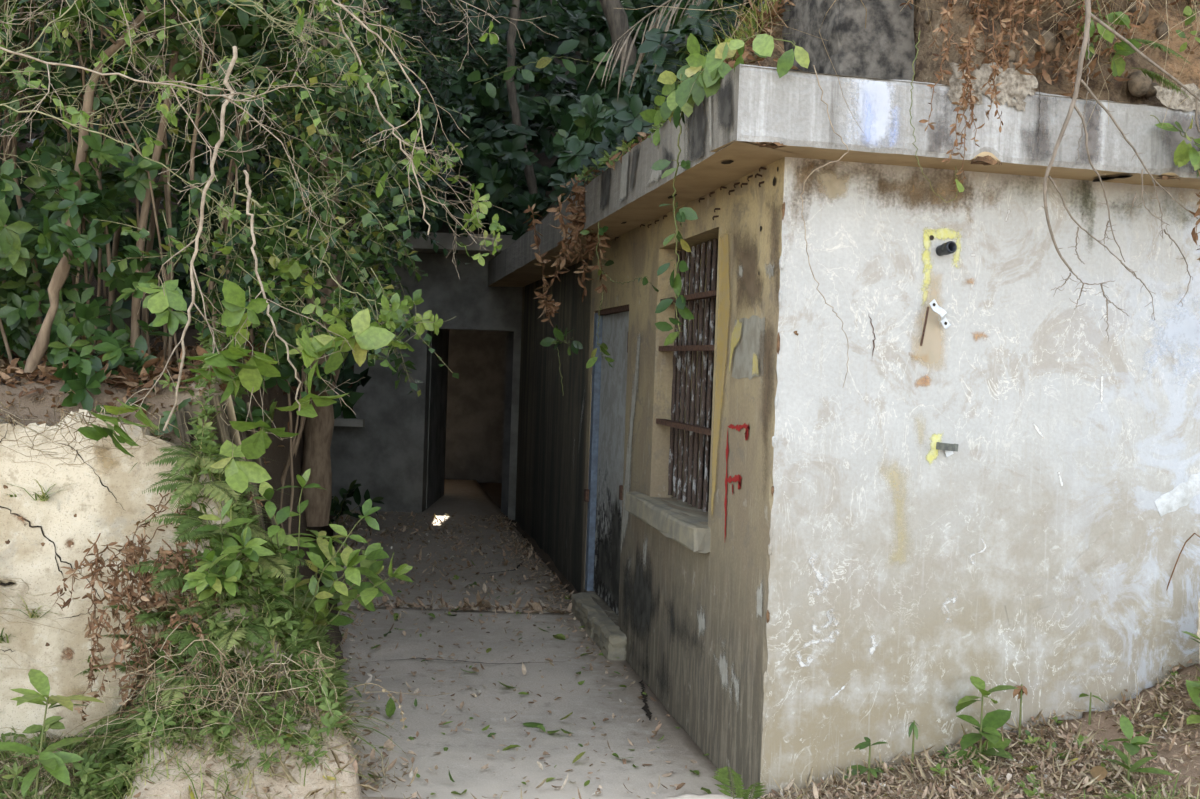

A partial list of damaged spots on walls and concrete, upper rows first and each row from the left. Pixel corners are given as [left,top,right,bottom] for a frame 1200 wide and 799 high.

leakage [797,163,848,194]
leakage [879,174,973,205]
leakage [922,228,959,302]
leakage [711,233,761,513]
leakage [752,329,772,443]
leakage [596,500,696,645]